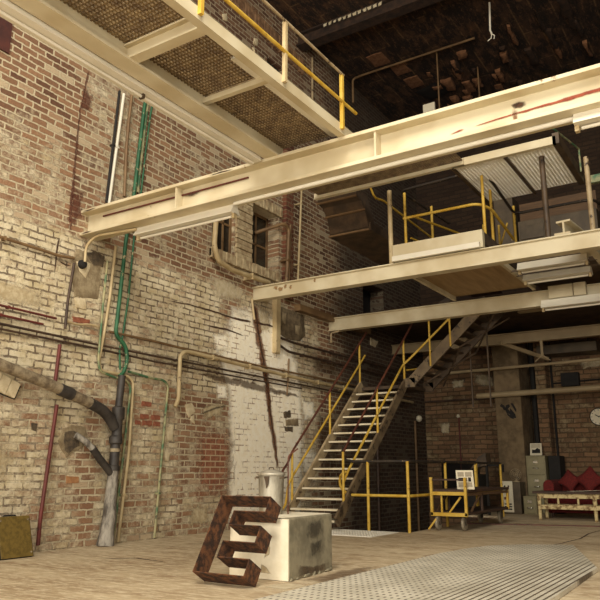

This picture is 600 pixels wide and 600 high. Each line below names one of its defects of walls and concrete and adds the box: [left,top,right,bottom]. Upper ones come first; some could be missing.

peeling [366,52,424,89]
rust [479,88,600,125]
flaking render [70,249,105,309]
peeling [198,307,315,510]
spalling [58,425,88,458]
peeling [229,507,259,519]